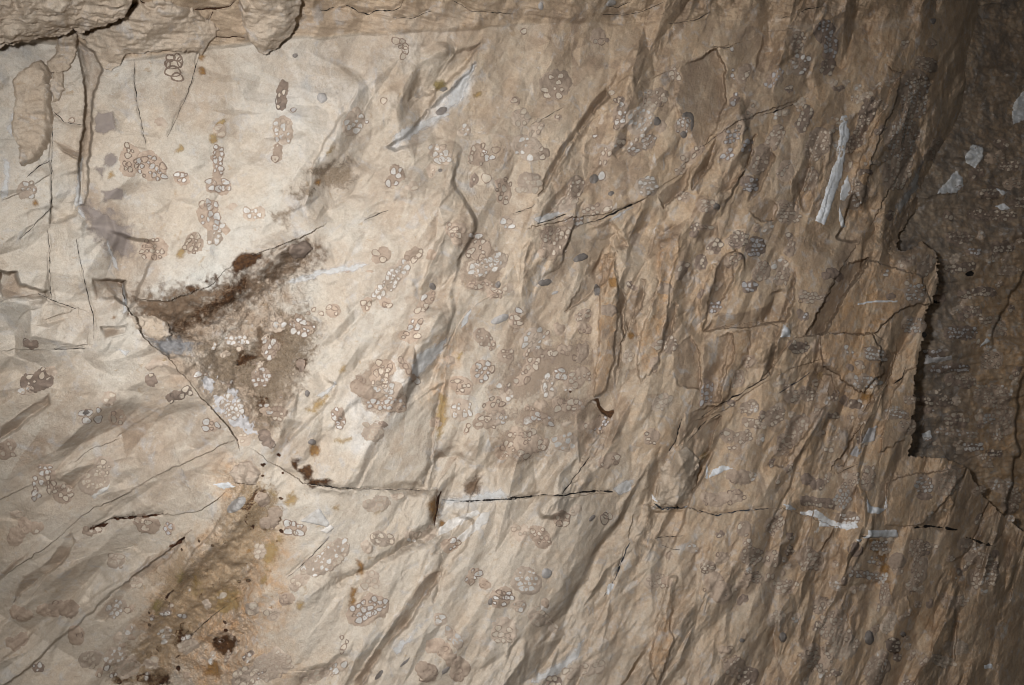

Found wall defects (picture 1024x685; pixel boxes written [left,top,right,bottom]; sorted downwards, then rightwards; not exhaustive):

damp [113,238,326,427]
crack [312,458,613,526]
crack [654,503,768,516]
crack [914,525,992,546]